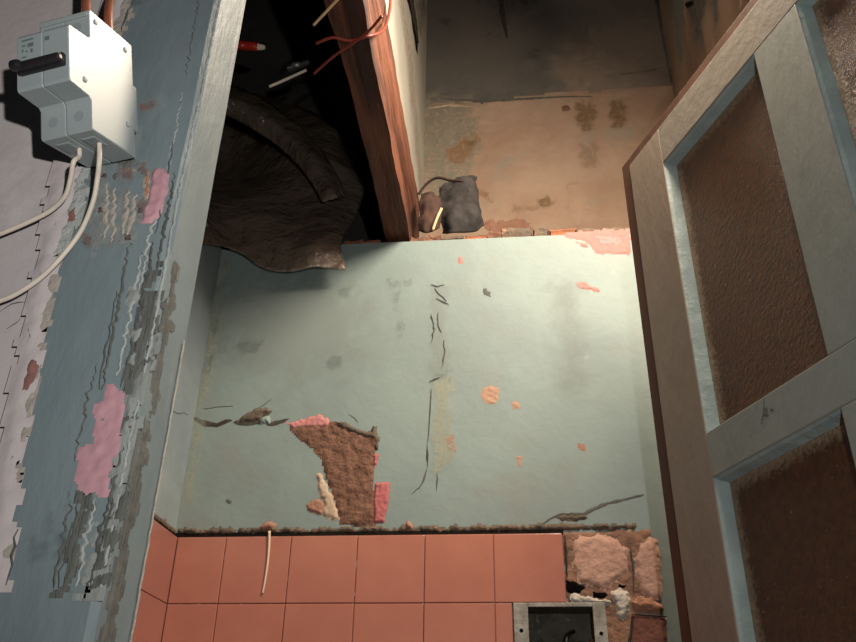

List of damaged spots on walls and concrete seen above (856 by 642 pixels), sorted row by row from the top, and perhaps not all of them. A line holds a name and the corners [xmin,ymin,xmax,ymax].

flaking render [410,86,675,255]
peeling [0,0,221,642]
peeling [576,282,600,292]
crack [173,400,289,427]
peeling [130,341,668,642]
crack [412,388,438,494]
crack [543,494,644,524]